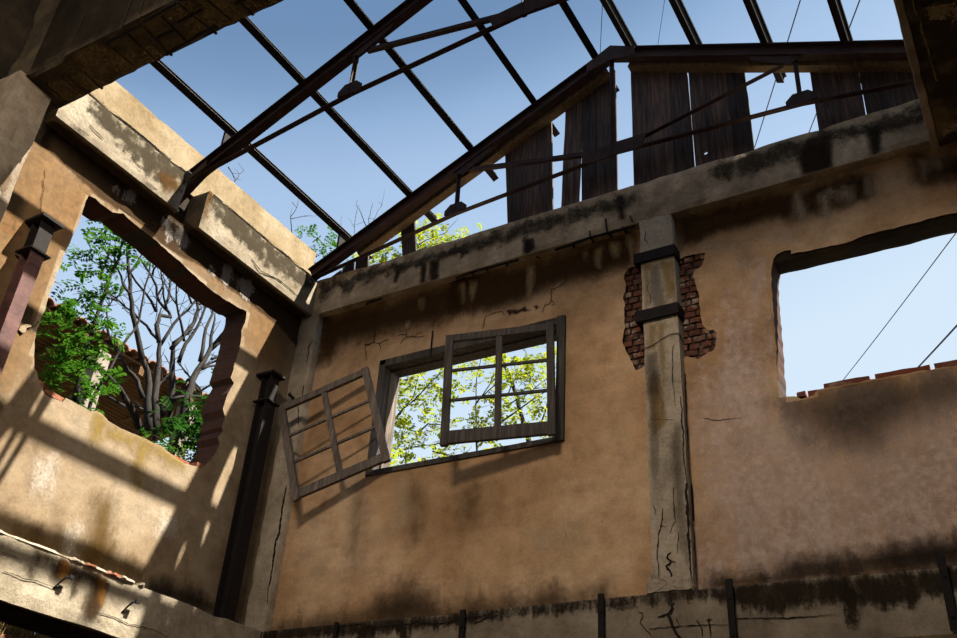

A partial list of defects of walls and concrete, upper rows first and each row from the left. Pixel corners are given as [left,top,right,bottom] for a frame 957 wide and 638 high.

spalling [44,0,280,101]
damp [798,138,832,174]
damp [867,130,881,155]
crack [365,332,423,356]
damp [317,236,635,363]
flaking render [623,268,645,369]
flaking render [678,254,717,359]
damp [814,378,957,433]
crack [639,348,831,638]
crack [267,486,287,603]
damp [262,536,957,638]